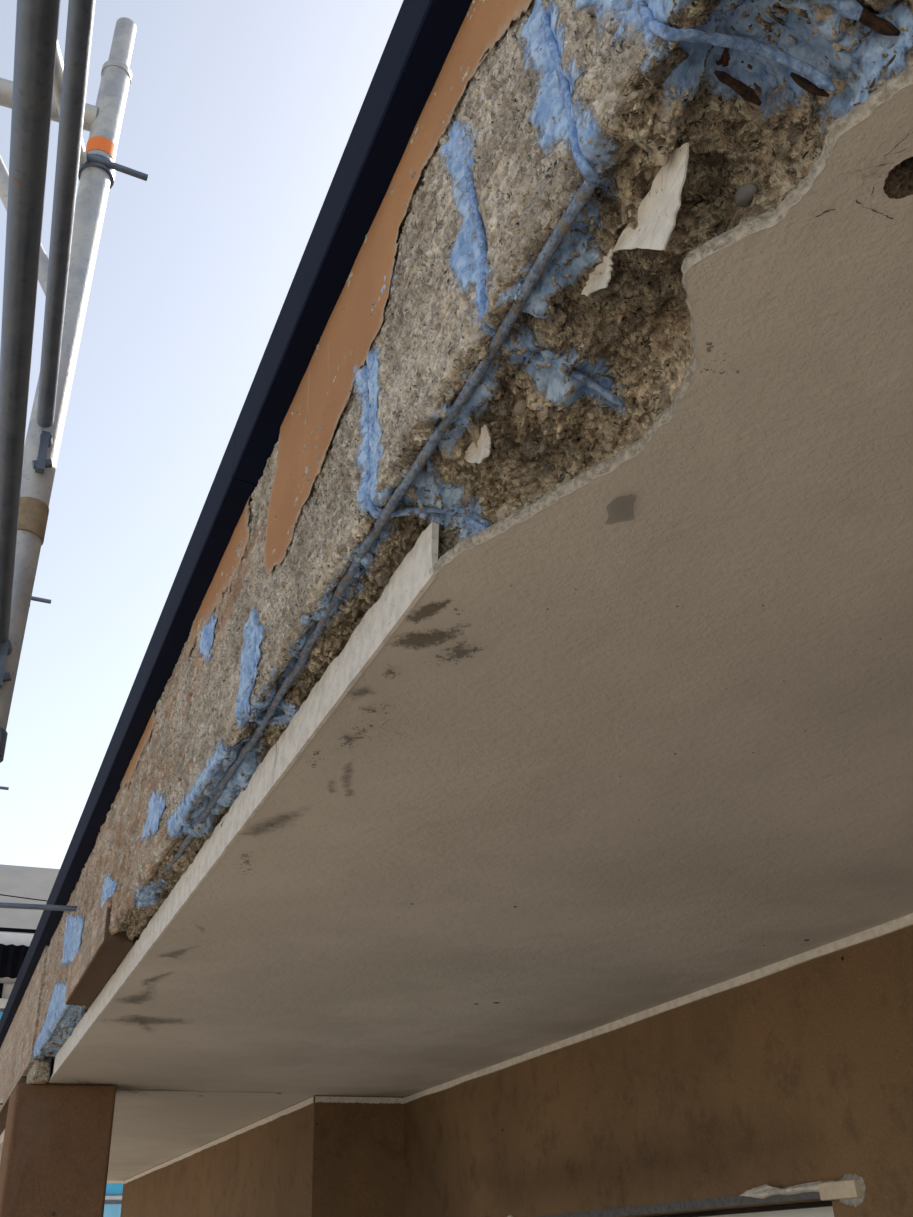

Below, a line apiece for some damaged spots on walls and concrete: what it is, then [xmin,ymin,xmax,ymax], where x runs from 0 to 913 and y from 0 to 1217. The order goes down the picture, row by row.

flaking render [33,0,658,1074]
water stain [395,600,483,663]
spalling [389,0,913,574]
corrosion [708,45,762,90]